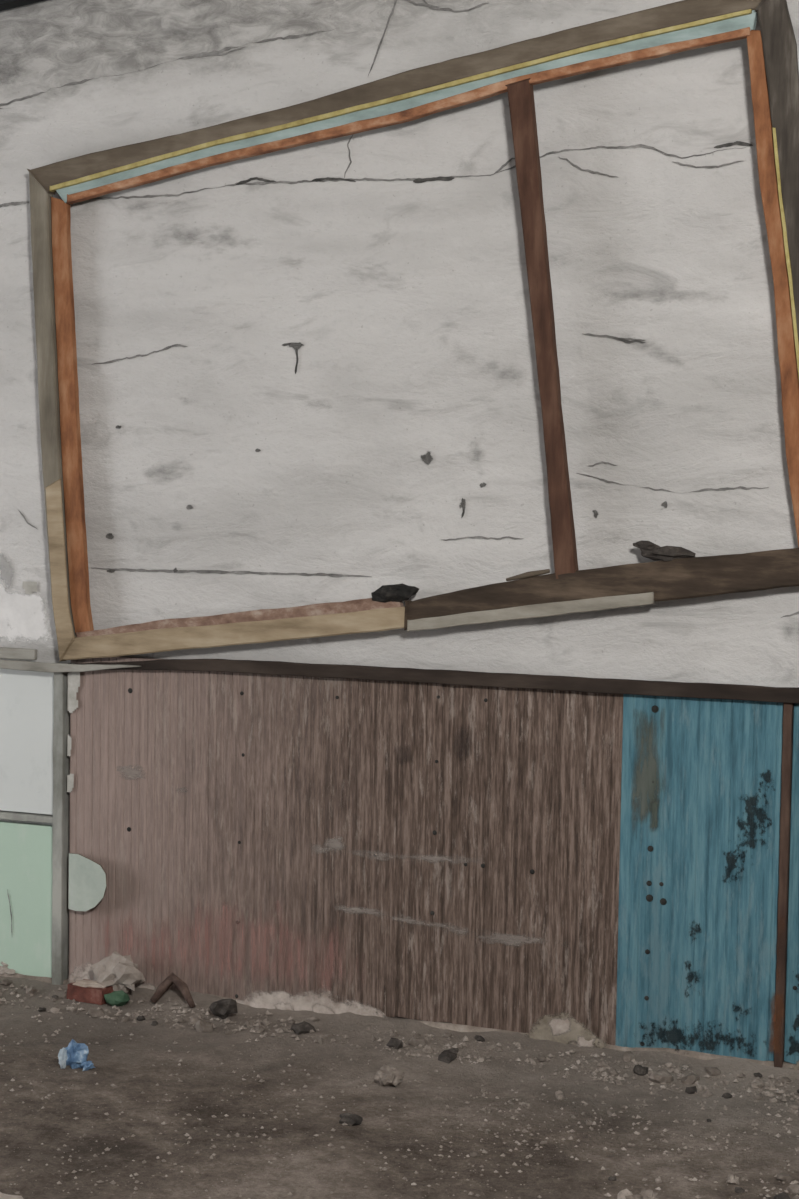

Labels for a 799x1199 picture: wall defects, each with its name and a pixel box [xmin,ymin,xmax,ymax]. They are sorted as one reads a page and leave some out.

crack [368,0,488,76]
crack [89,135,753,200]
crack [0,200,29,208]
crack [444,534,521,542]
peeling [0,555,49,642]
crack [97,568,371,577]